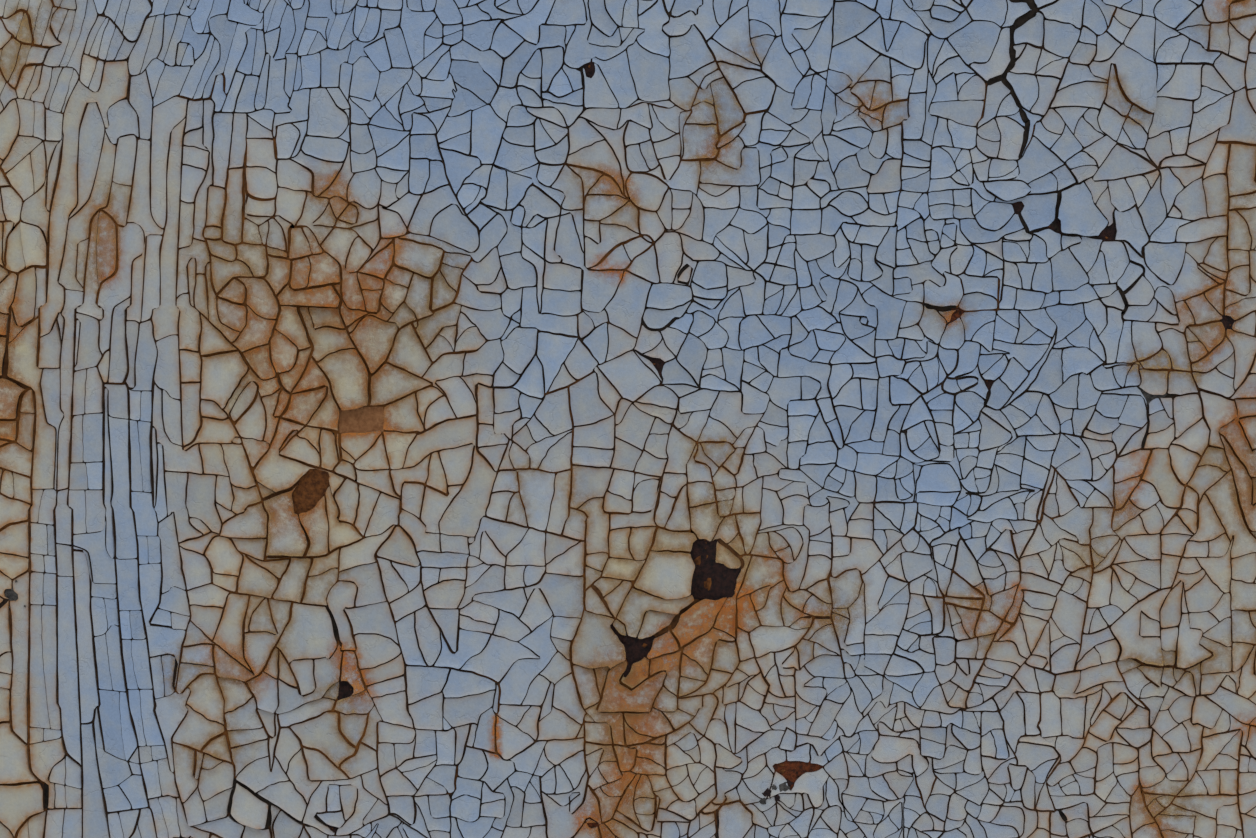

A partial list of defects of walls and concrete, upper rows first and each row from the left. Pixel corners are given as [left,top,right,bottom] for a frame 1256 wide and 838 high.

corrosion [203,223,450,451]
crack [0,0,194,838]
corrosion [253,490,340,600]
peeling [254,419,344,556]
peeling [572,528,741,712]
corrosion [577,537,848,838]
peeling [719,760,824,838]
crack [769,768,869,838]
crack [857,683,1020,838]
crack [980,691,1083,838]
crack [1129,642,1256,838]
peeling [1219,399,1256,531]